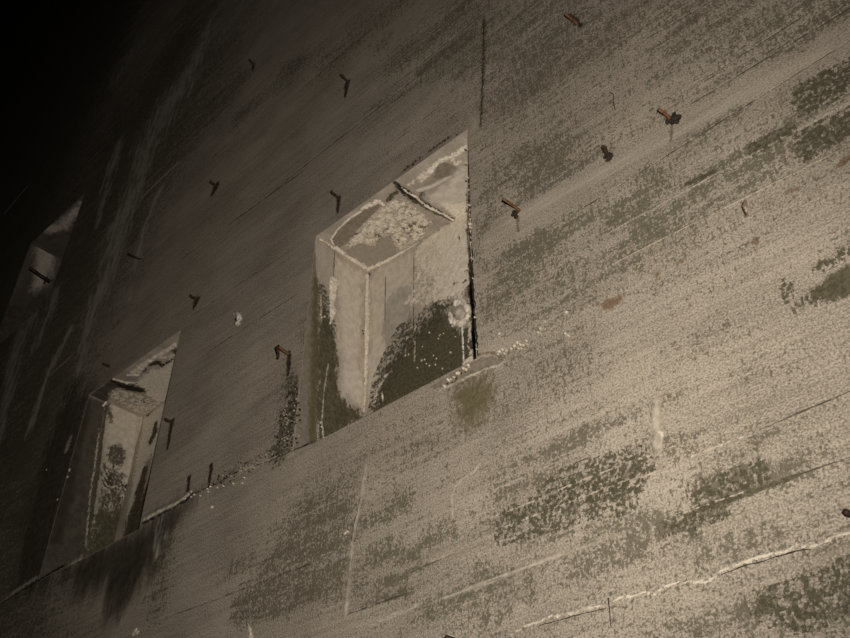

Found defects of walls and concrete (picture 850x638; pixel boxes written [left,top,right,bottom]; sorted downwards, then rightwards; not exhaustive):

crack [478,18,486,127]
leakage [318,145,476,412]
leakage [68,343,187,616]
crack [510,532,850,636]